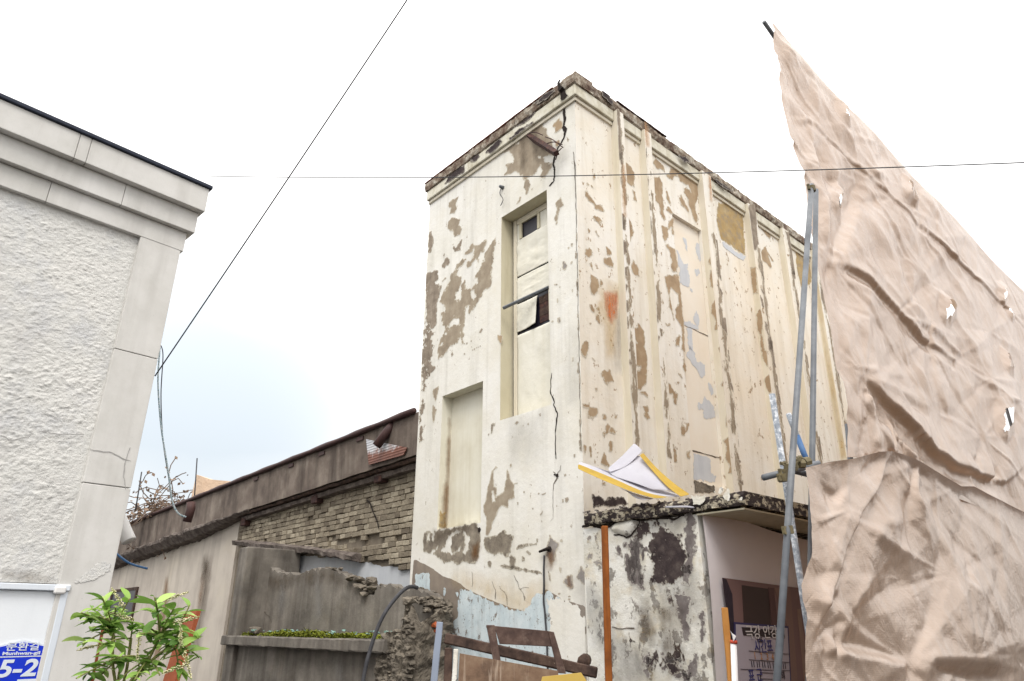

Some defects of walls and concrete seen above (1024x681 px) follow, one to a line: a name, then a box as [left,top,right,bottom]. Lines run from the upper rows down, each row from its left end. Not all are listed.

peeling [445,90,563,204]
peeling [418,196,496,442]
crack [549,79,582,489]
peeling [585,109,788,493]
crack [0,431,130,490]
peeling [314,464,602,681]
spalling [592,482,628,508]
damp [583,500,667,514]
damp [615,498,706,681]